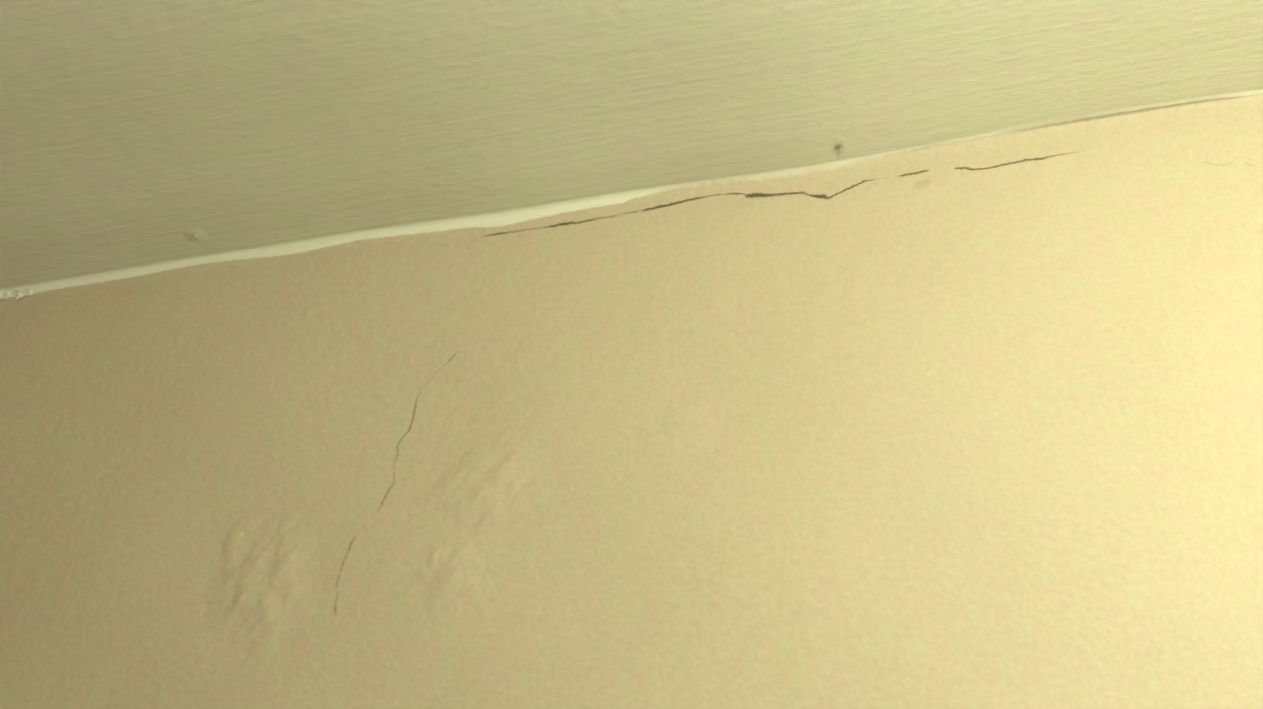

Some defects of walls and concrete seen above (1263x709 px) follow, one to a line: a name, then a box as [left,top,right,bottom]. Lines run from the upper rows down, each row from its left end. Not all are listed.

crack [901,154,1061,181]
crack [551,180,867,230]